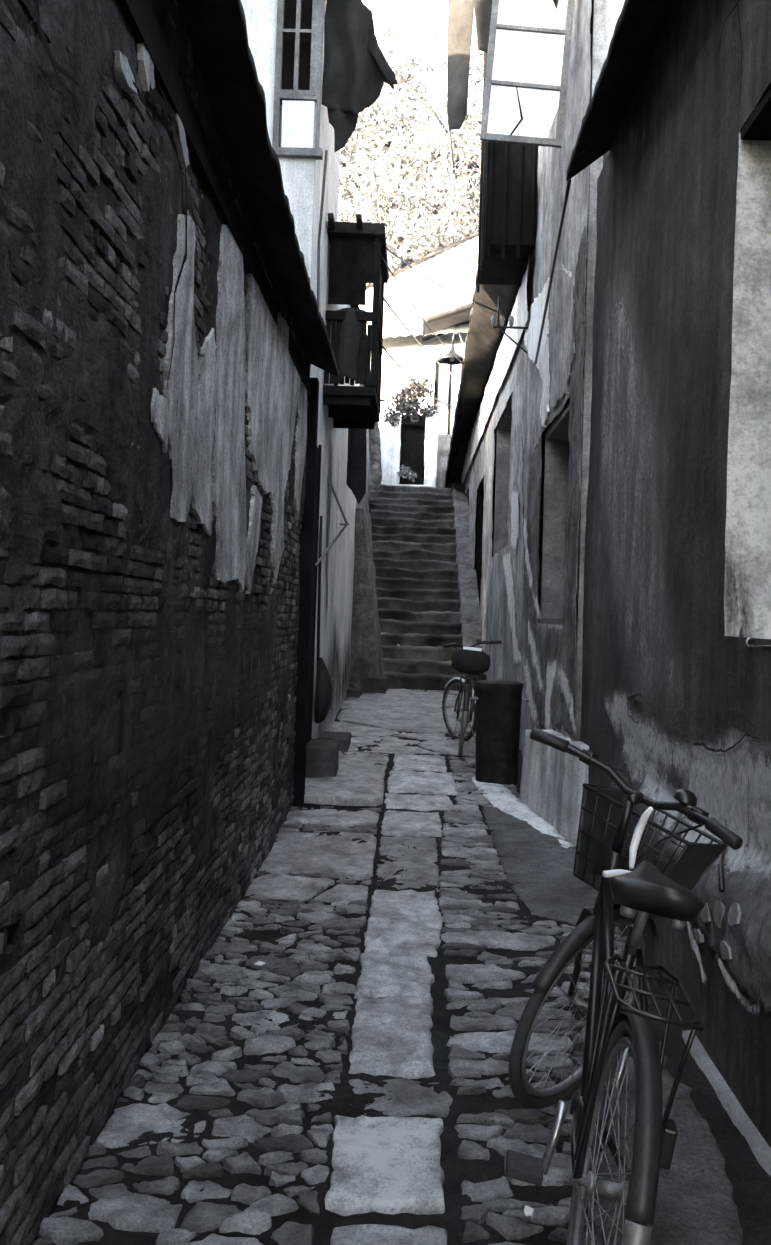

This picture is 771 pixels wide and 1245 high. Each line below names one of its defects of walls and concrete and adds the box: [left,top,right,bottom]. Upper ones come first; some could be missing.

peeling [113,43,155,94]
peeling [171,113,189,168]
peeling [151,210,307,594]
peeling [605,691,771,1013]
crack [694,734,767,867]